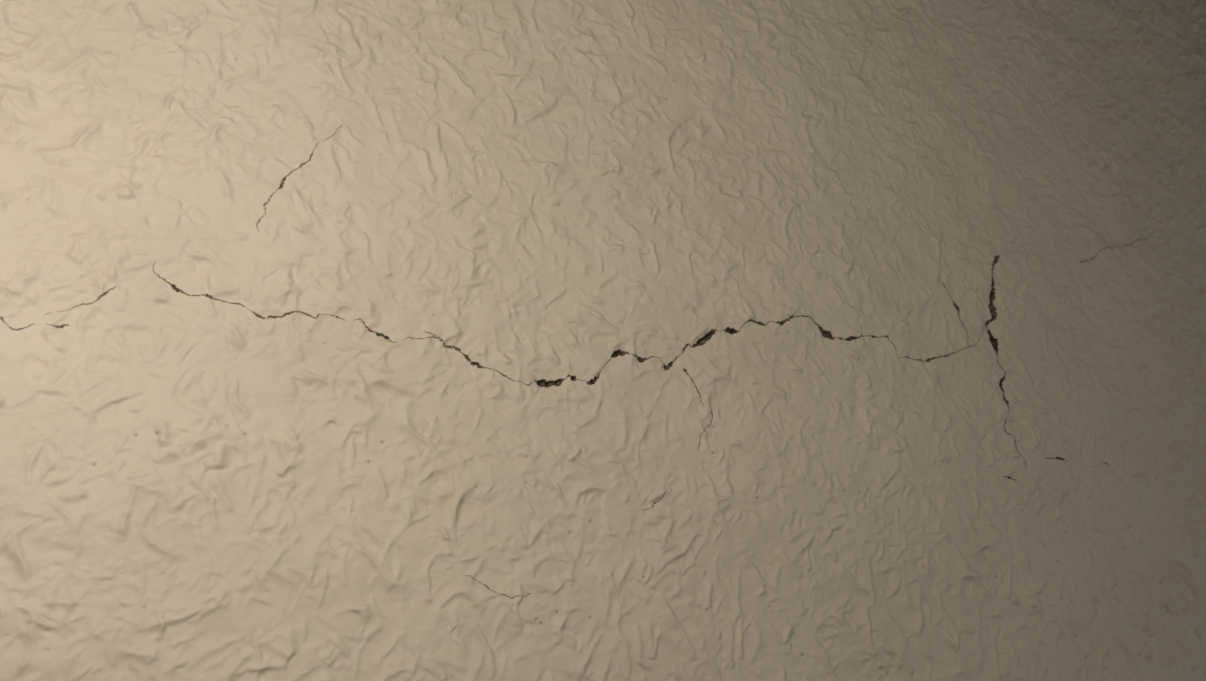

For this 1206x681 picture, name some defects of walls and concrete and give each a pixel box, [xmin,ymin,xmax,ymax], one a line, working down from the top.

crack [153,254,1067,481]